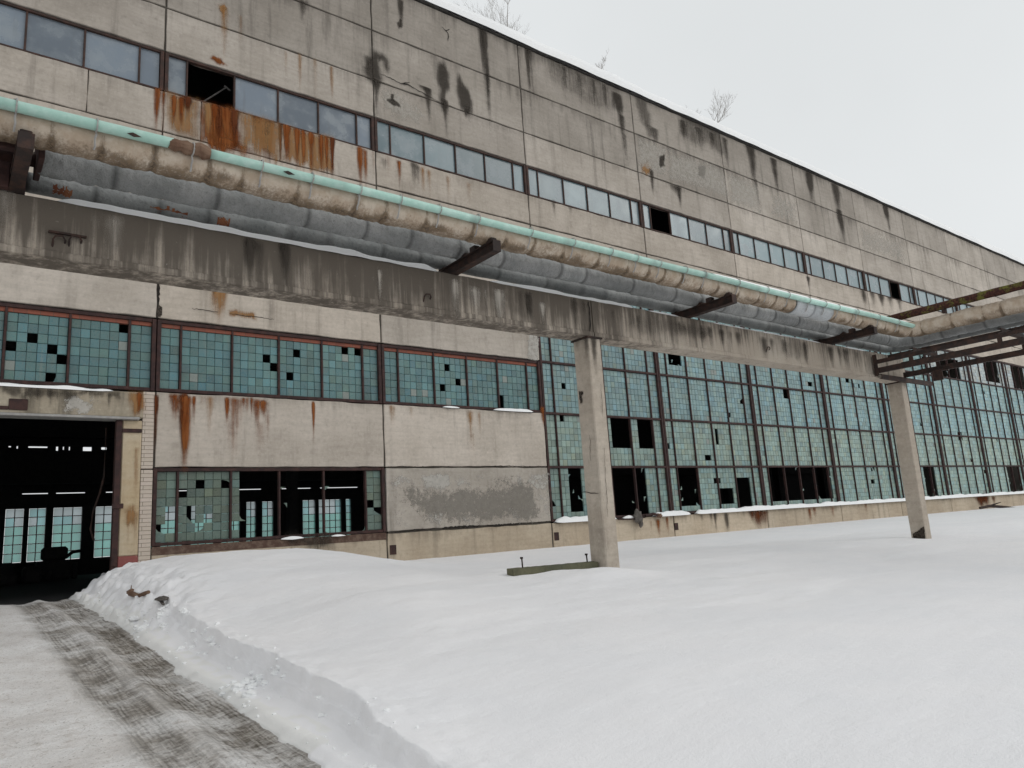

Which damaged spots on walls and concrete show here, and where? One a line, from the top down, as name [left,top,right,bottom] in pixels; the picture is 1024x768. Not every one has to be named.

water stain [366,52,388,100]
water stain [420,64,472,117]
rust [154,88,335,171]
water stain [746,146,755,175]
water stain [832,183,844,232]
water stain [246,238,256,269]
water stain [280,244,290,274]
rust [213,292,254,319]
rust [130,392,196,454]
rust [225,397,266,418]
spalling [394,473,550,525]